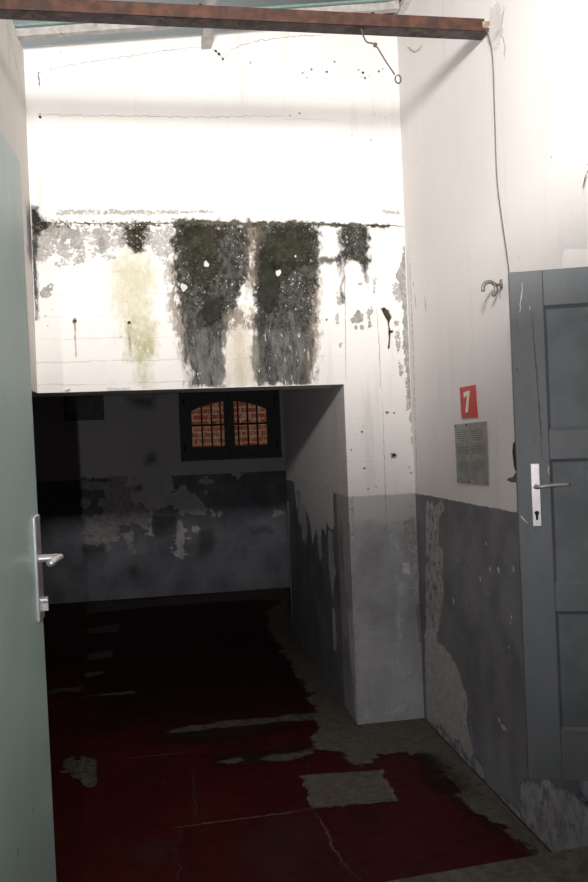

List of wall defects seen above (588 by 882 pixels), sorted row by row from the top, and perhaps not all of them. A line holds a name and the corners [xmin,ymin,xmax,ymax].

crack [6,19,323,98]
damp [167,218,372,387]
peeling [79,473,588,855]
peeling [58,756,99,788]